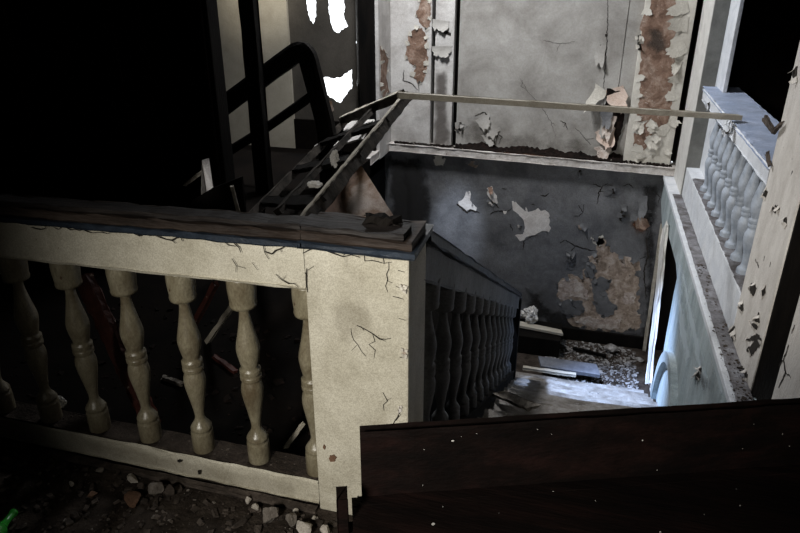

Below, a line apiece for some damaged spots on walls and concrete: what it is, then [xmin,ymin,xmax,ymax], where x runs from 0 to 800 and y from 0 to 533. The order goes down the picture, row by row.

peeling [404,0,432,85]
peeling [584,0,689,163]
peeling [456,191,479,213]
peeling [512,201,551,241]
crack [226,243,404,320]
spalling [554,223,645,334]
peeling [737,282,766,314]
crack [351,325,391,355]
peeling [728,312,762,356]